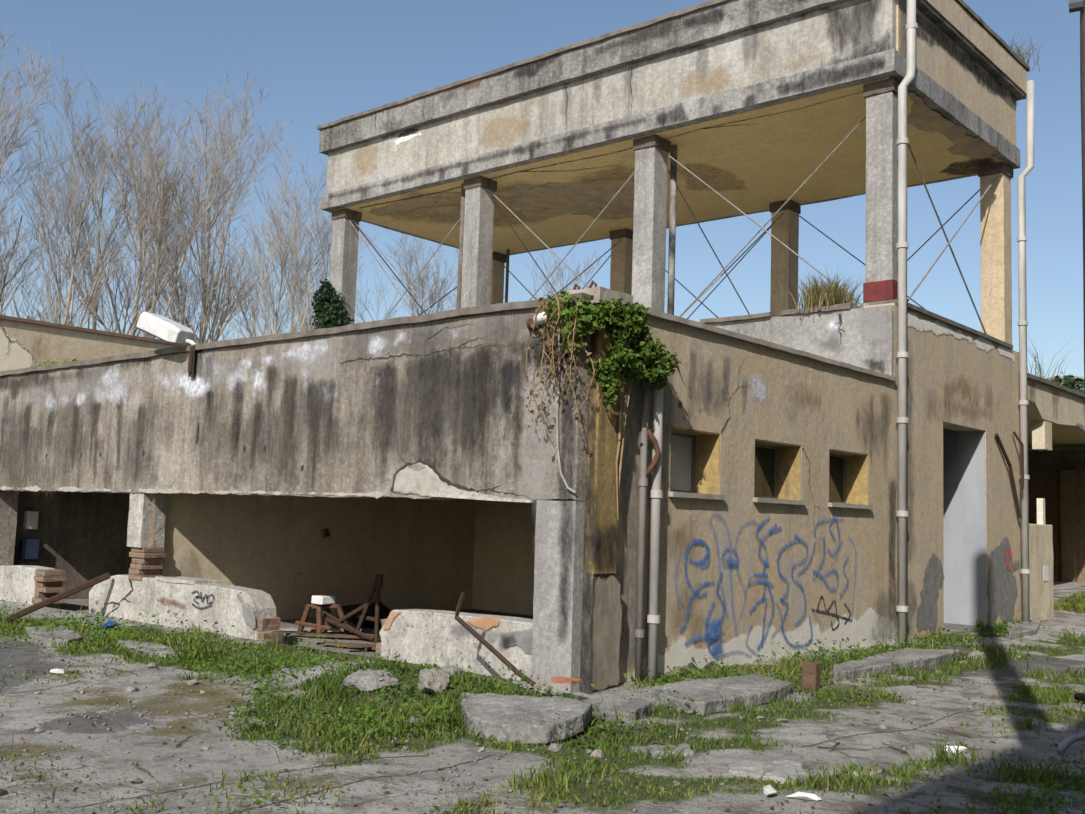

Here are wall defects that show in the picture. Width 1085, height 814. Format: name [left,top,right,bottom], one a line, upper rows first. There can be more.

leakage [515,54,556,77]
leakage [596,21,672,51]
leakage [685,10,723,27]
leakage [779,0,890,93]
leakage [605,104,685,138]
leakage [383,142,541,186]
peeling [0,313,35,371]
peeling [907,312,1015,362]
leakage [0,359,150,465]
leakage [160,341,334,457]
spalling [127,458,533,503]
crack [104,579,133,614]